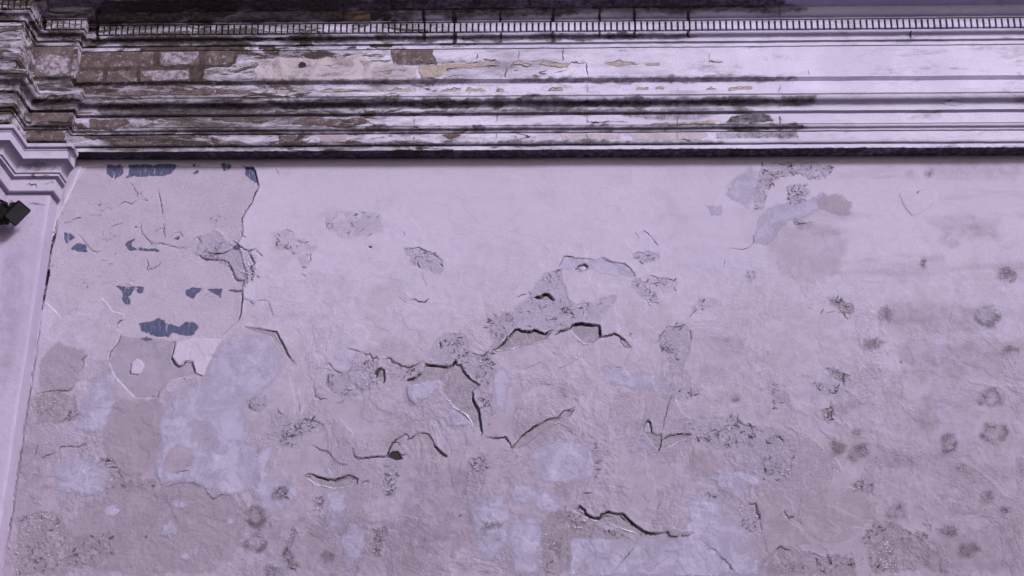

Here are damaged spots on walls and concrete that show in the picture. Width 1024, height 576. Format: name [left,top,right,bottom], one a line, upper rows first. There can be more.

flaking render [34,45,570,96]
spalling [603,59,660,67]
water stain [85,133,190,141]
spalling [279,117,349,153]
water stain [98,94,815,139]
spalling [561,120,717,140]
peeling [754,161,850,215]
peeling [34,162,326,512]
crack [277,348,419,483]
peeling [326,253,927,576]